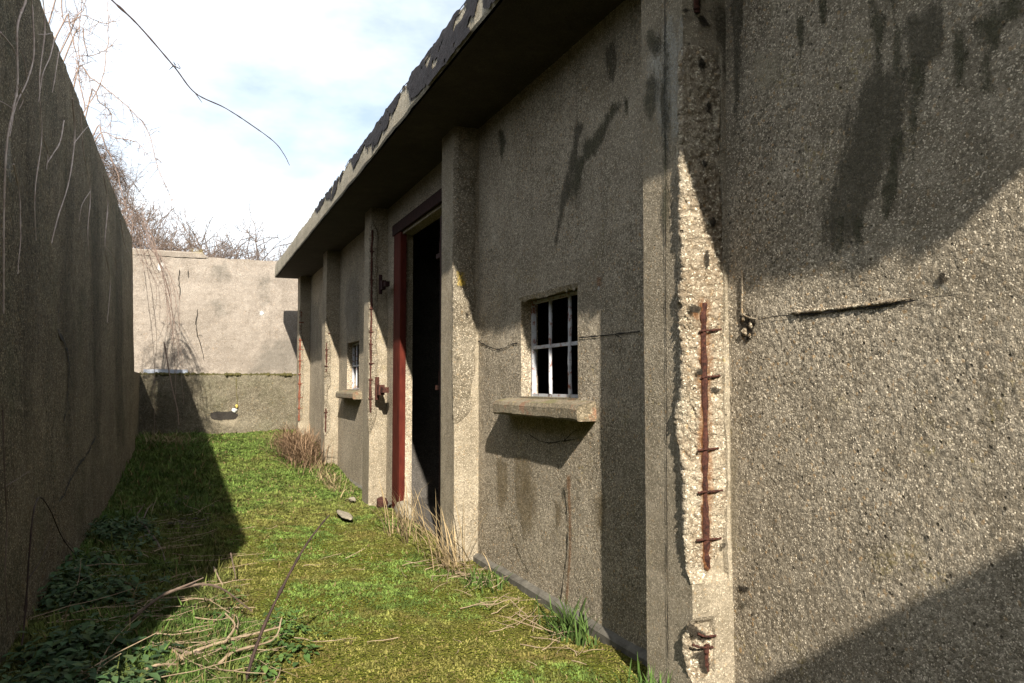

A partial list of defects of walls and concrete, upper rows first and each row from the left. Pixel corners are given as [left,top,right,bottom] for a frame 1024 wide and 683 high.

spalling [682,0,712,26]
peeling [315,0,495,212]
leakage [567,96,629,205]
leakage [820,0,969,271]
spalling [673,46,727,584]
crack [758,294,958,320]
spalling [681,621,716,678]